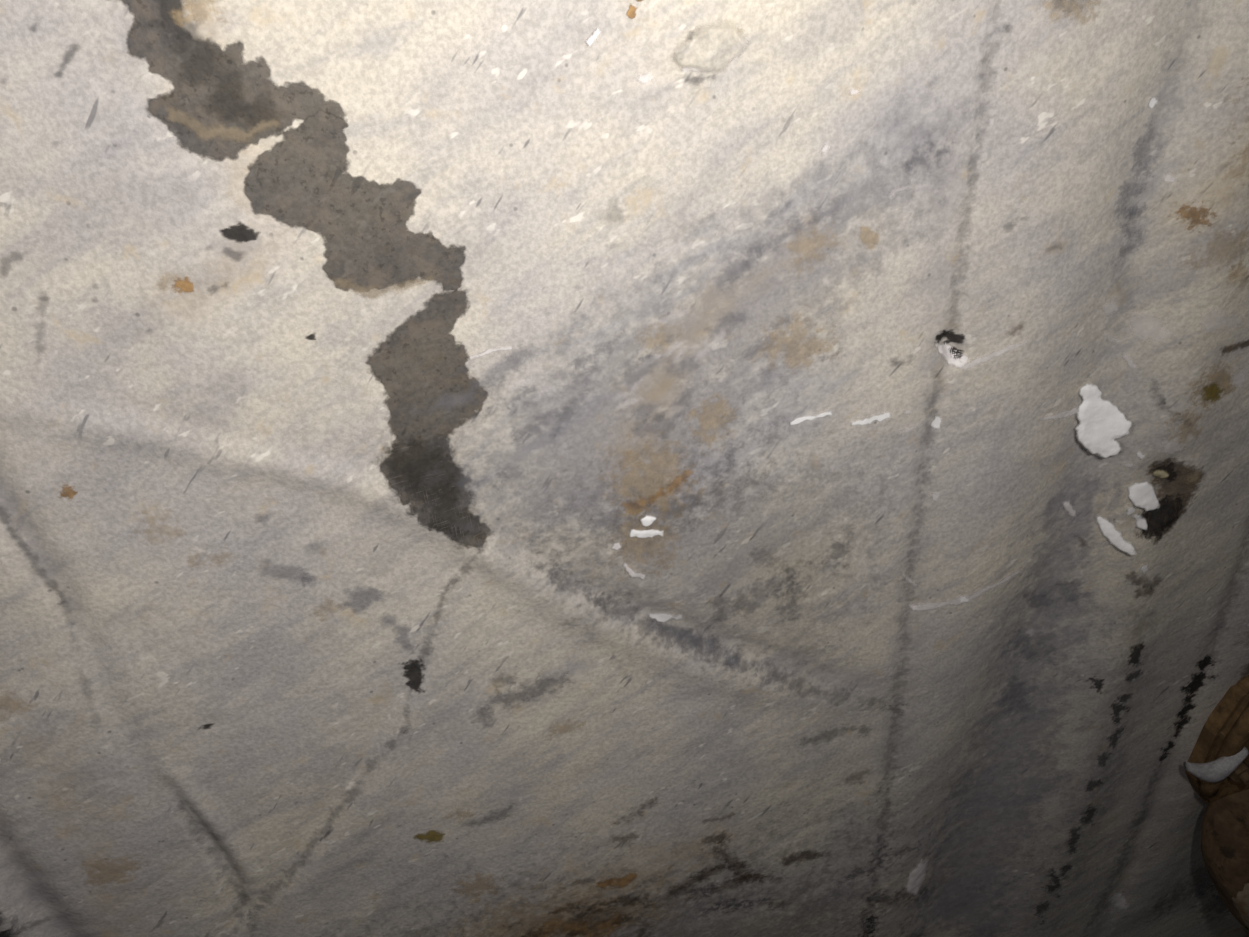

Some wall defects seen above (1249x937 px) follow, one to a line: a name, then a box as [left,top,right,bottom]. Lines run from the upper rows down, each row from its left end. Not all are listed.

leakage [122,0,490,547]
spalling [935,330,1027,369]
peeling [1044,384,1203,542]
peeling [1097,516,1148,573]
crack [404,660,423,693]